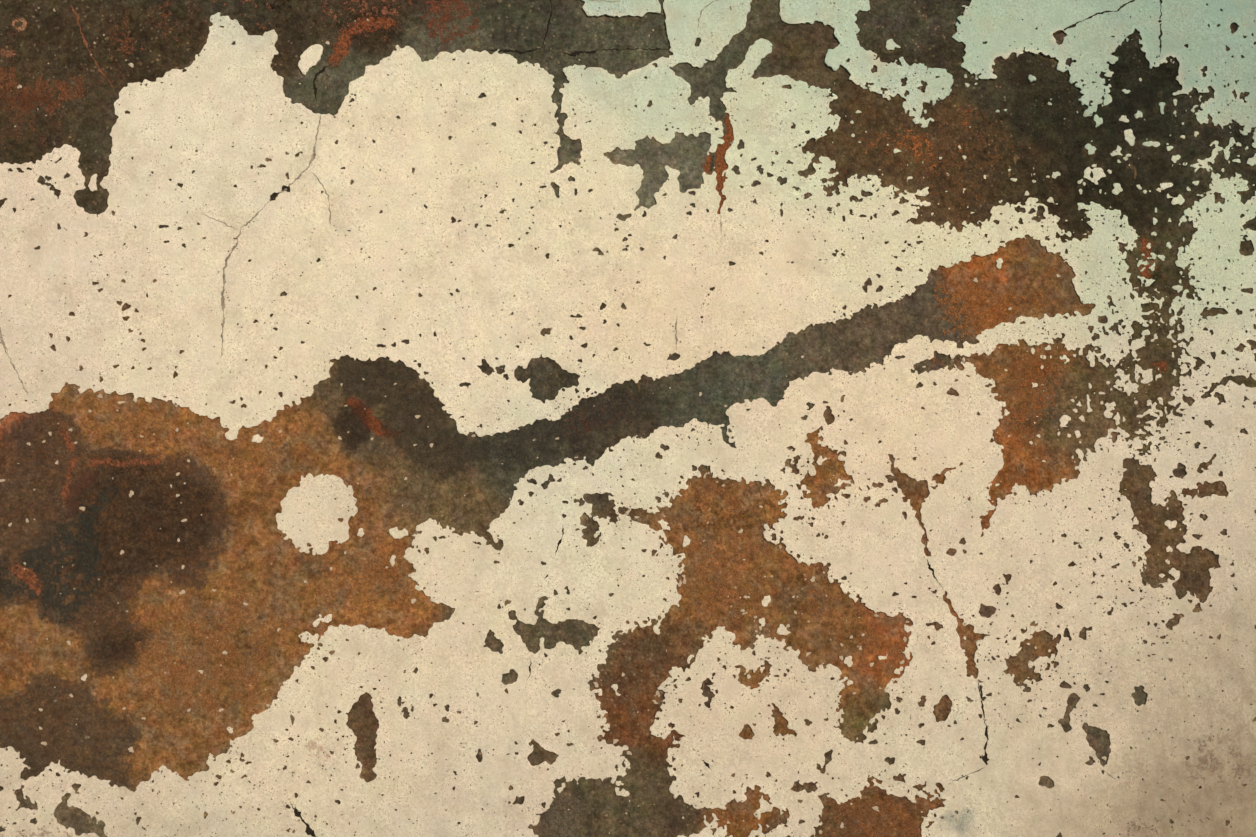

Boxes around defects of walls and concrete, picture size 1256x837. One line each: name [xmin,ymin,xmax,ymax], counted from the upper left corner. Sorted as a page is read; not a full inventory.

corrosion [312,0,480,66]
crack [1054,0,1163,53]
corrosion [0,48,84,118]
corrosion [702,114,734,214]
peeling [113,301,153,370]
corrosion [60,422,160,517]
corrosion [10,563,43,596]
peeling [944,530,982,570]
peeling [499,669,520,718]
peeling [1122,672,1165,712]
peeling [466,720,573,771]
crack [950,682,990,784]